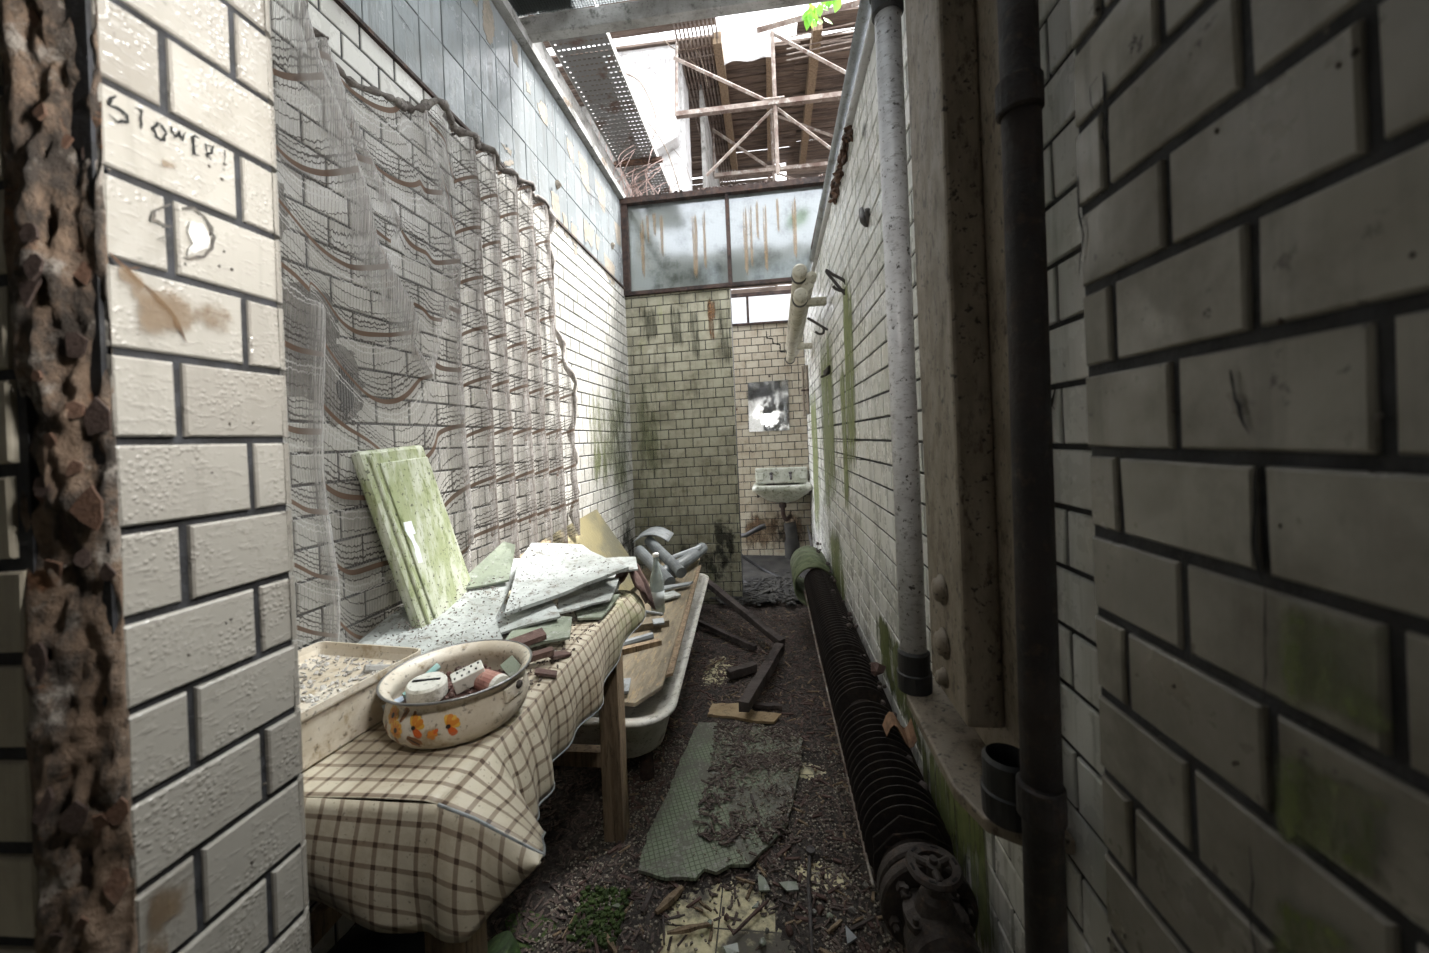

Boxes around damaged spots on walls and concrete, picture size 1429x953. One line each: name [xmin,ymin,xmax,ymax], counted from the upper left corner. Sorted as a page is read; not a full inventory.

rust [625,125,853,205]
rust [640,214,664,276]
rust [692,214,707,275]
rust [743,198,797,274]
water stain [643,308,700,357]
water stain [840,365,849,506]